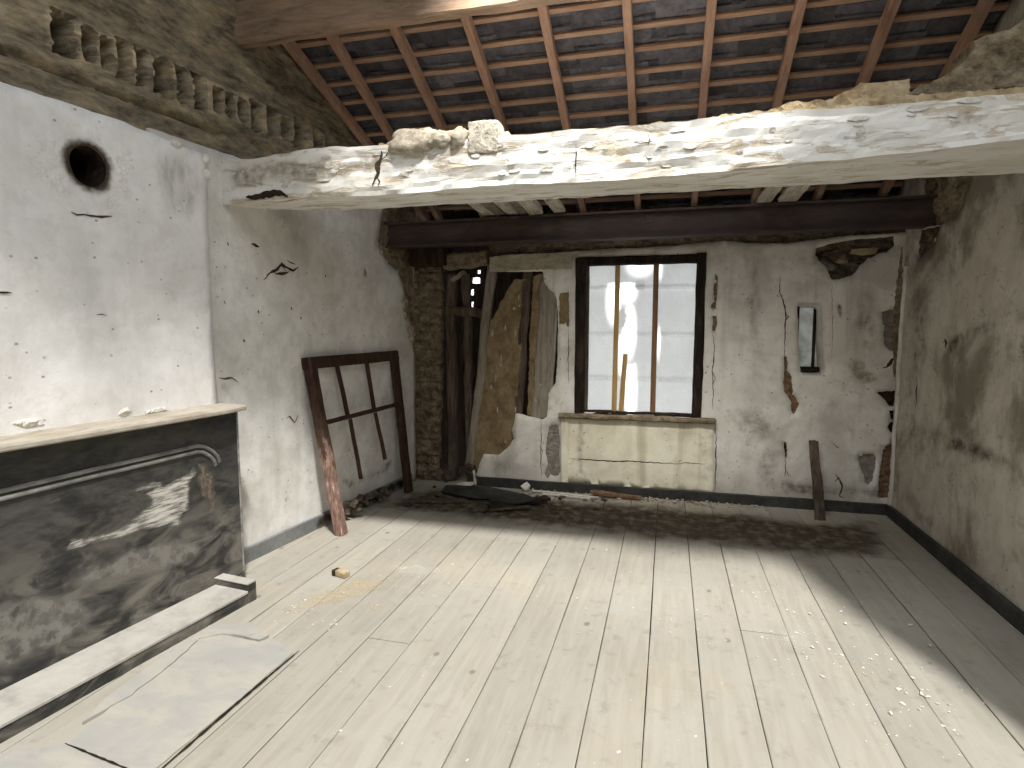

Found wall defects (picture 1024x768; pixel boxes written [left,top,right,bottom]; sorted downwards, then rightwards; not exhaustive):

crack [72,211,112,219]
crack [264,260,298,280]
spalling [815,247,892,280]
crack [777,284,789,356]
spalling [881,307,898,351]
spalling [783,356,799,414]
crack [570,336,717,490]
spalling [545,425,561,478]
spalling [858,391,895,501]